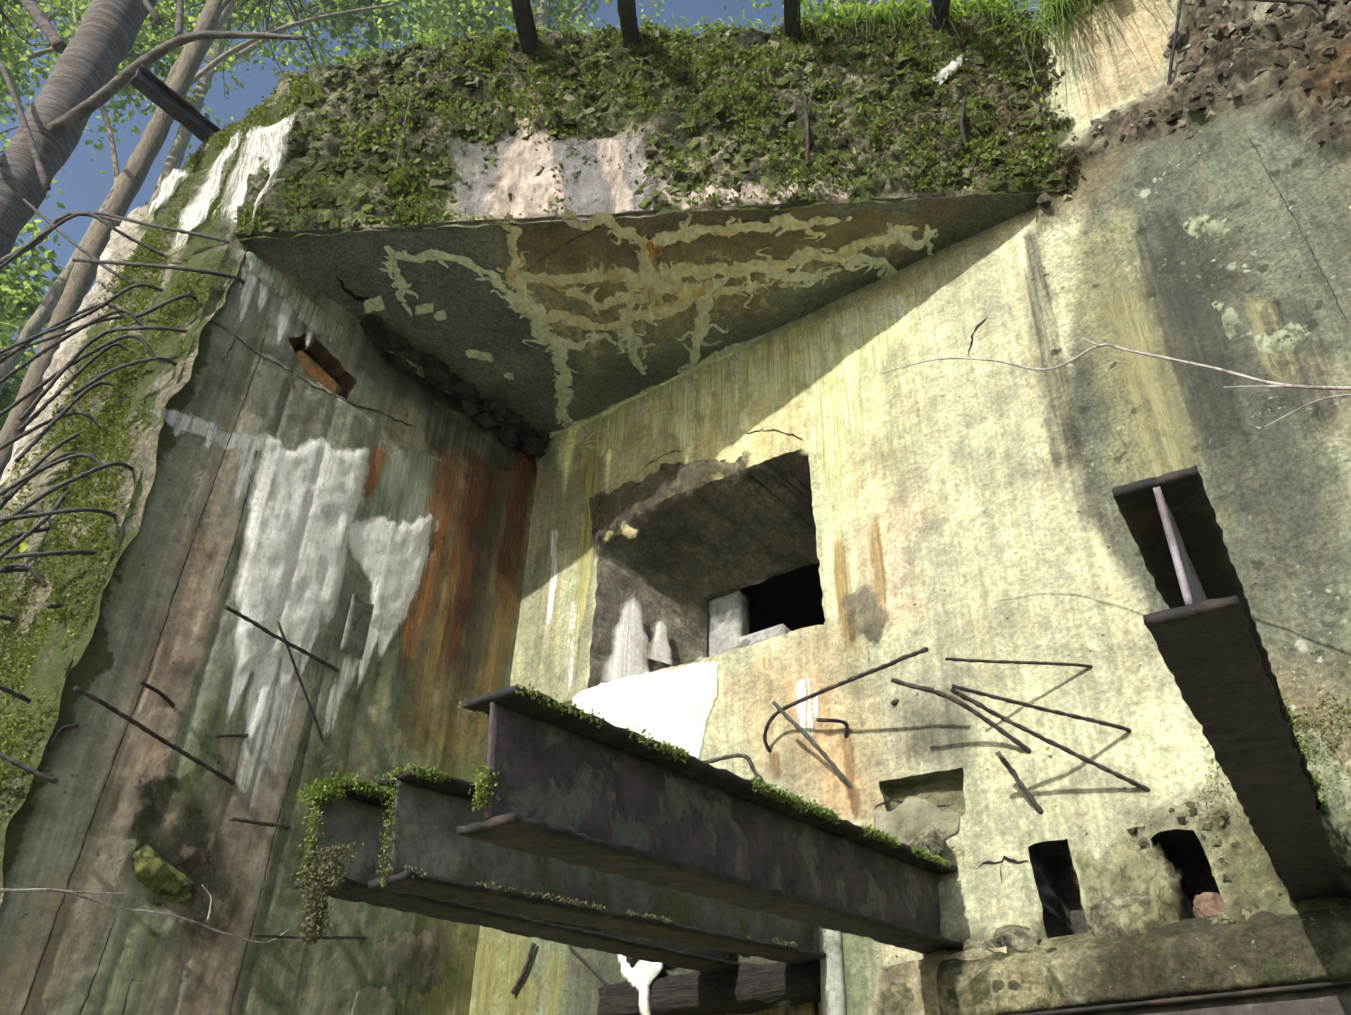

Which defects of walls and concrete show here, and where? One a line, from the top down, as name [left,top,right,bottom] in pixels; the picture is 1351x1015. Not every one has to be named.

leakage [363,208,938,492]
leakage [1025,234,1078,465]
leakage [1107,213,1234,477]
leakage [1249,301,1335,420]
corrosion [361,447,386,497]
corrosion [399,453,462,672]
spalling [589,451,747,555]
crack [21,313,415,1015]
spalling [224,605,340,742]
spalling [703,753,765,785]
spalling [874,796,959,845]
spalling [763,647,1150,814]